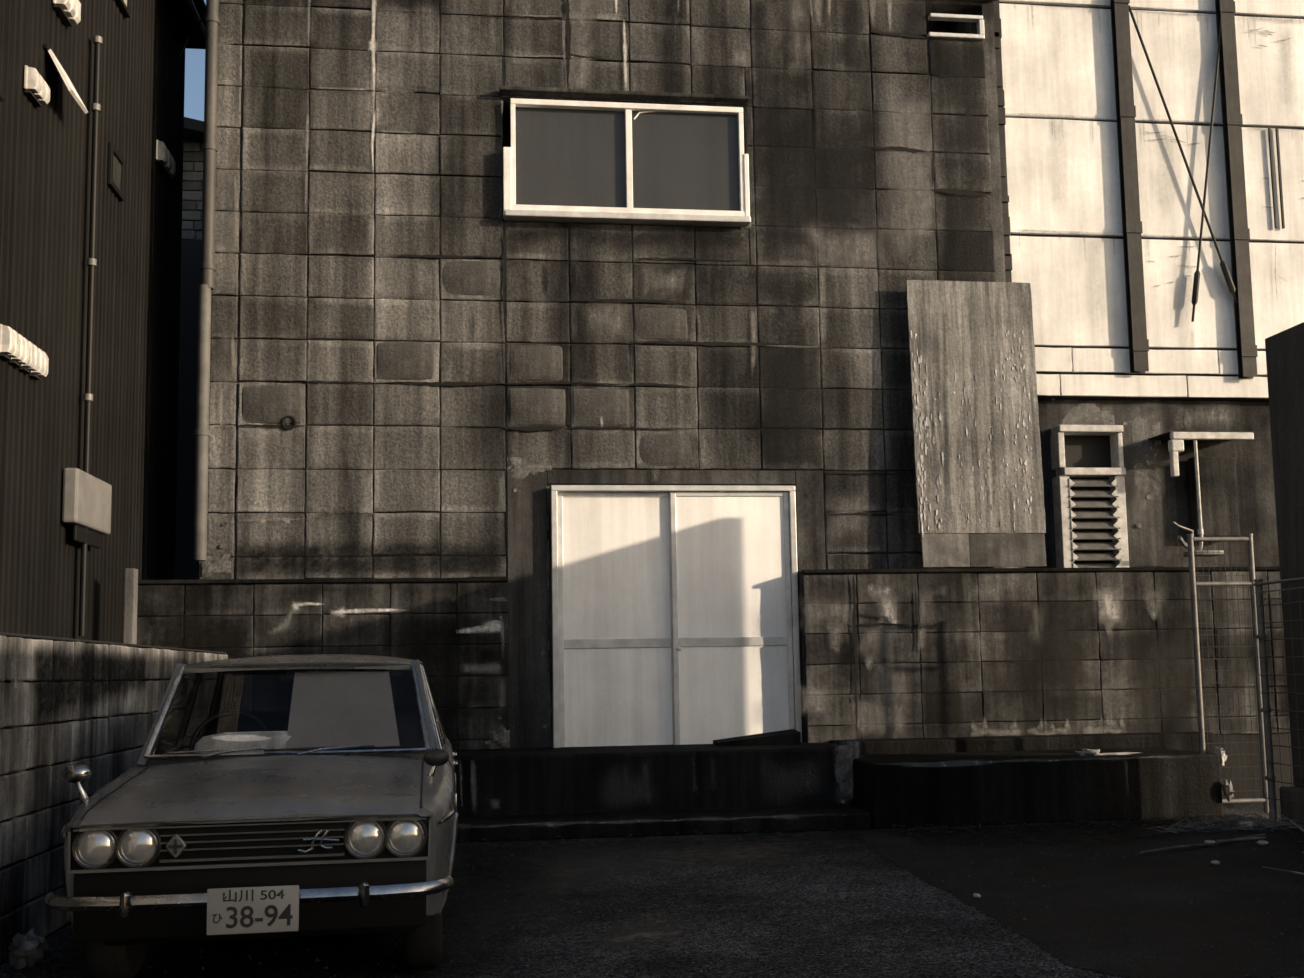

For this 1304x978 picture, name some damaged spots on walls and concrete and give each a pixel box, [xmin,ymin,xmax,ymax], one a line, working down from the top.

damp [362,0,390,92]
damp [753,115,878,261]
damp [893,105,931,239]
peeling [910,330,1033,537]
damp [11,608,256,716]